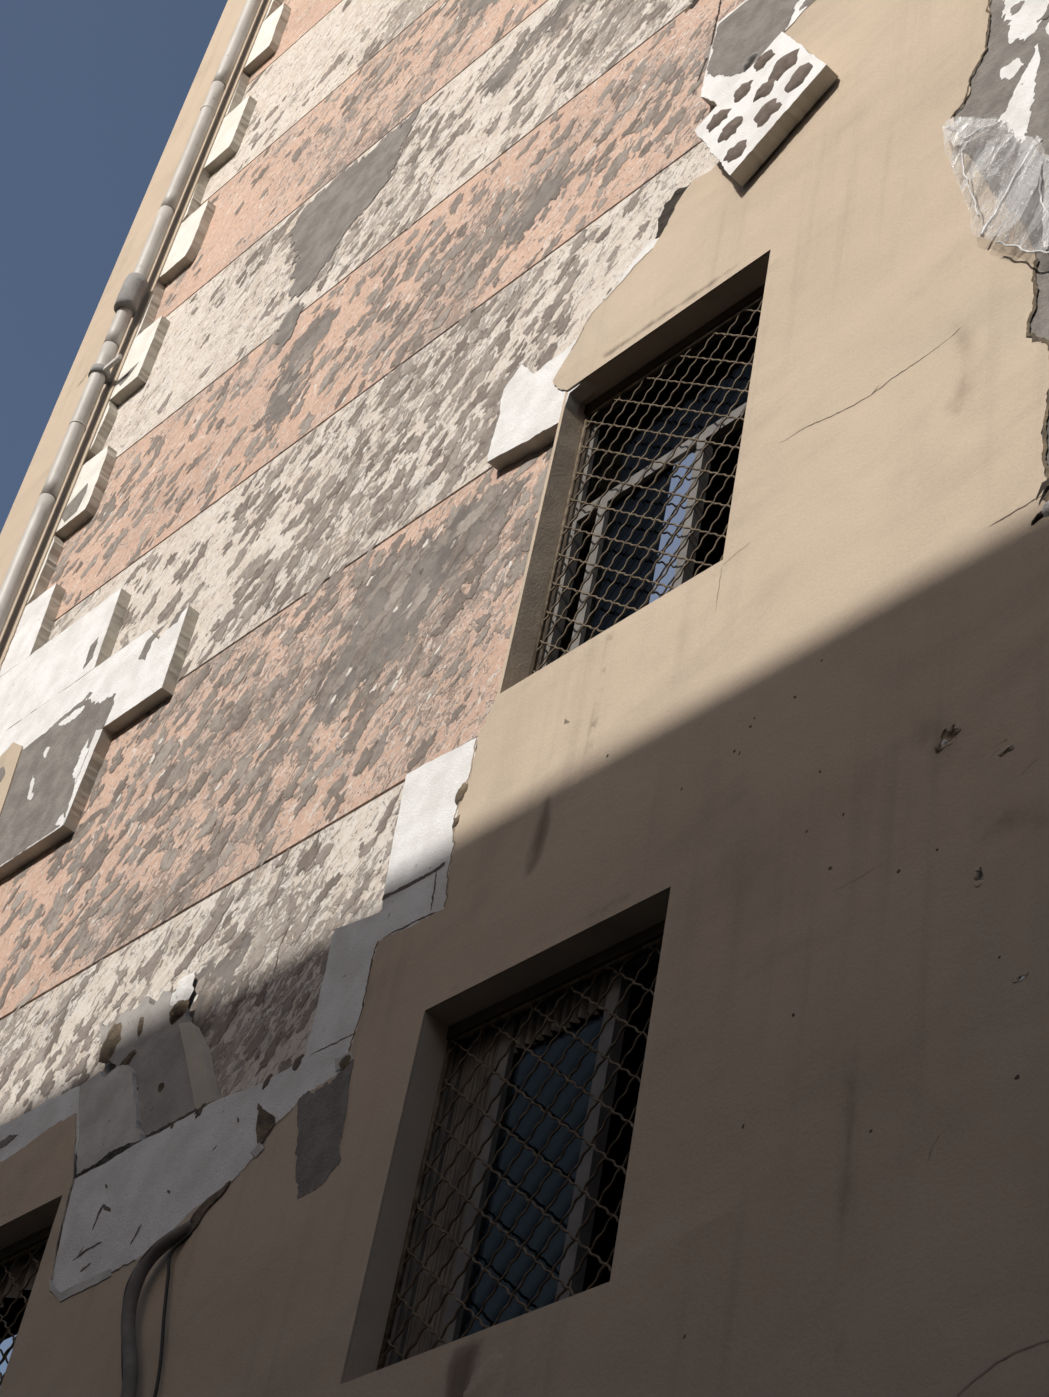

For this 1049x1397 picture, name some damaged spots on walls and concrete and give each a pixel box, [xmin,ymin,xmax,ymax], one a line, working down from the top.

peeling [994,0,1049,143]
crack [782,328,960,442]
spalling [1031,478,1049,526]
peeling [59,689,113,726]
peeling [72,739,89,782]
peeling [99,1017,144,1066]
peeling [169,999,189,1025]
spalling [292,1054,305,1071]
spalling [251,1074,276,1158]
peeling [295,1052,354,1198]
spalling [49,1184,112,1302]
spalling [182,1181,231,1244]